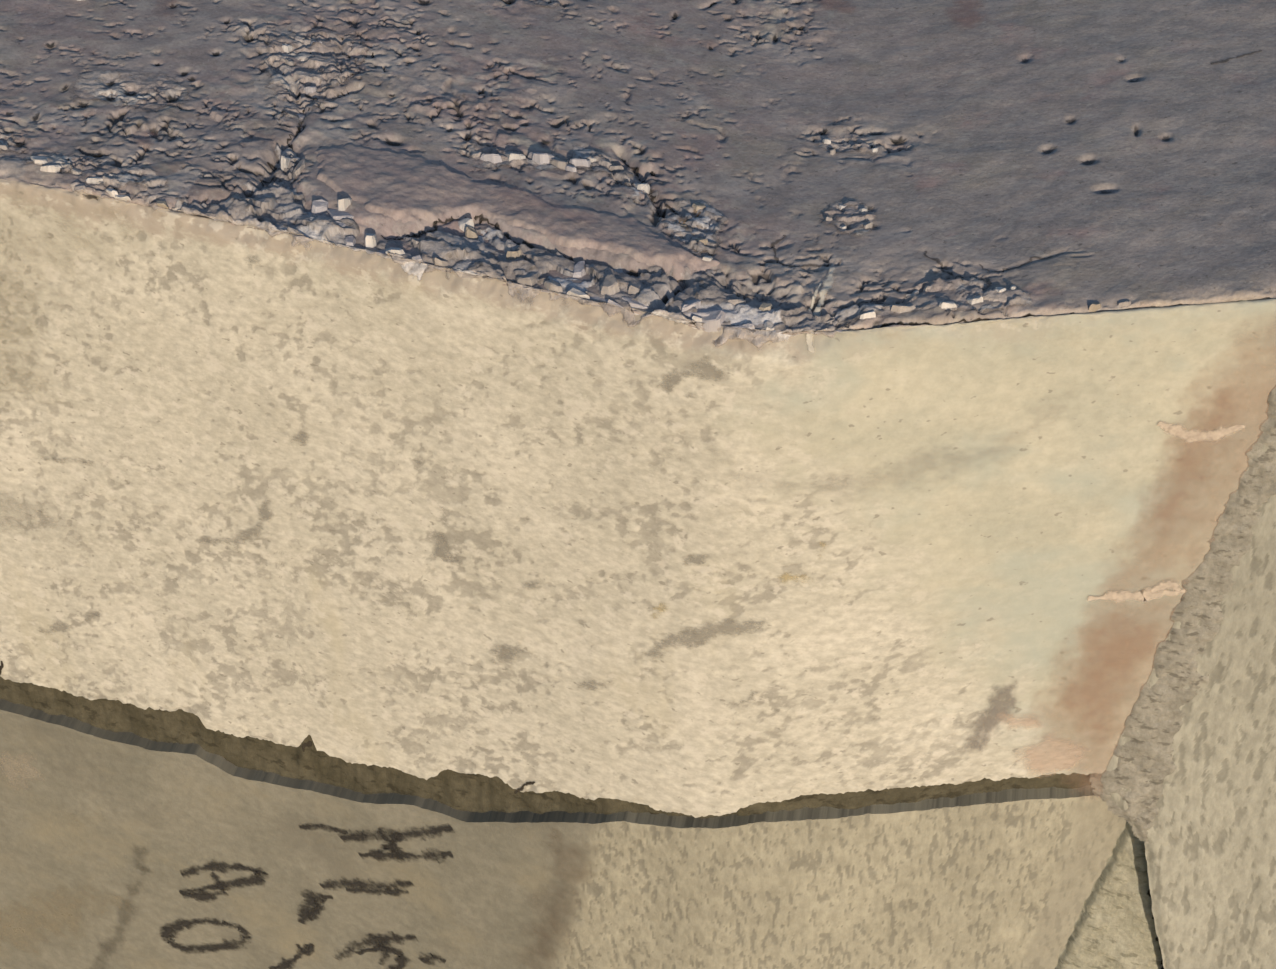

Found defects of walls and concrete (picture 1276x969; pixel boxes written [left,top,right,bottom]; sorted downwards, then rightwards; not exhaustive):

spalling [62,63,195,112]
crack [260,37,374,186]
spalling [0,113,1032,348]
crack [1147,889,1164,969]